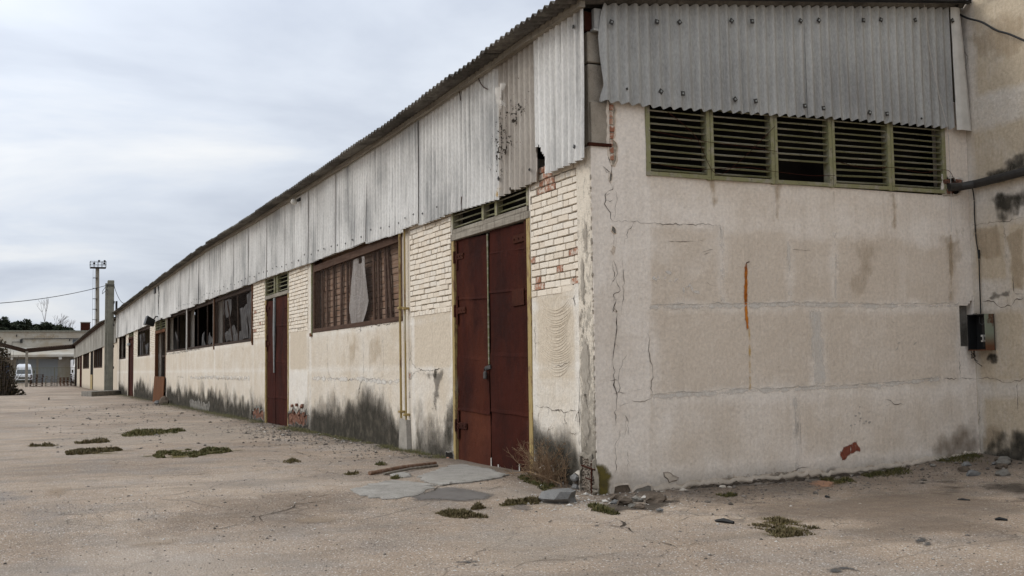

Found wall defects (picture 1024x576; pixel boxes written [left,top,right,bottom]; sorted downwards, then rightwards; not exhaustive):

flaking render [606,100,618,183]
crack [604,158,723,472]
leakage [167,388,263,422]
leakage [292,392,399,448]